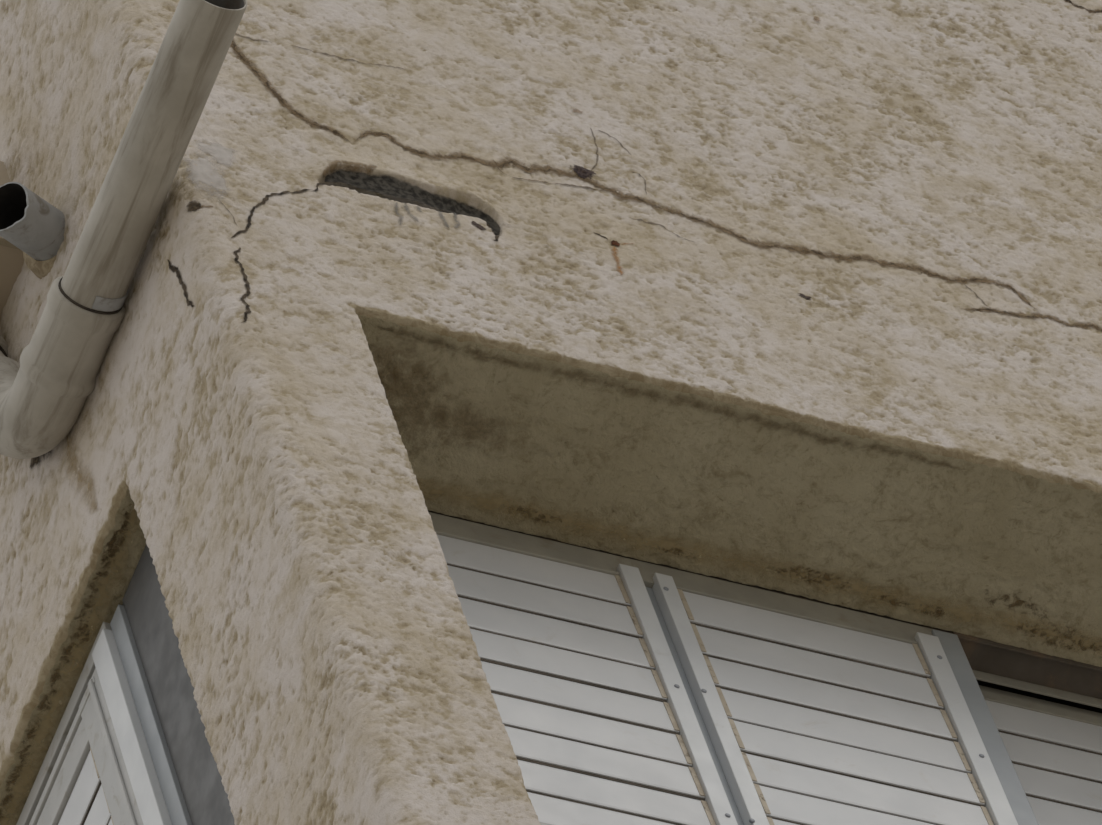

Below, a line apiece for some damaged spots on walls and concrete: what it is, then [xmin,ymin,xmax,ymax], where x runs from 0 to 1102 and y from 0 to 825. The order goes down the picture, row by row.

crack [1065,0,1102,13]
spalling [323,160,500,241]
crack [220,34,1102,331]
crack [168,260,194,307]
water stain [379,355,434,421]
water stain [778,566,1102,651]
water stain [0,510,135,825]